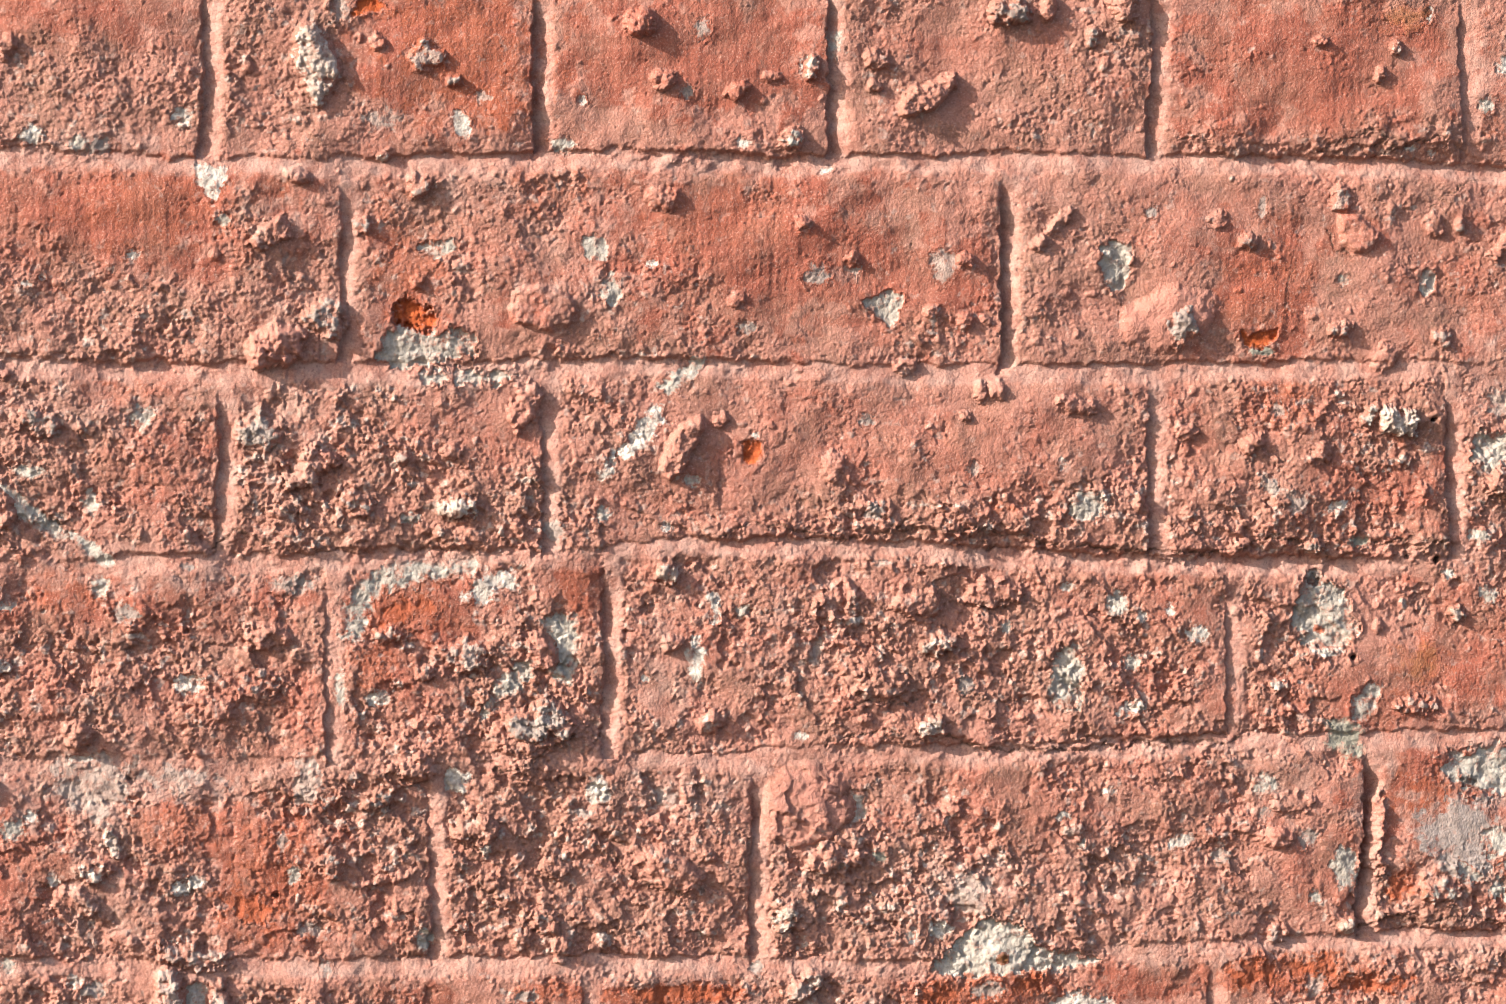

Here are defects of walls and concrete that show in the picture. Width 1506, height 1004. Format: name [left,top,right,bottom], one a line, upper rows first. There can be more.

spalling [374,292,522,390]
spalling [1290,567,1363,648]
spalling [902,869,1122,1004]